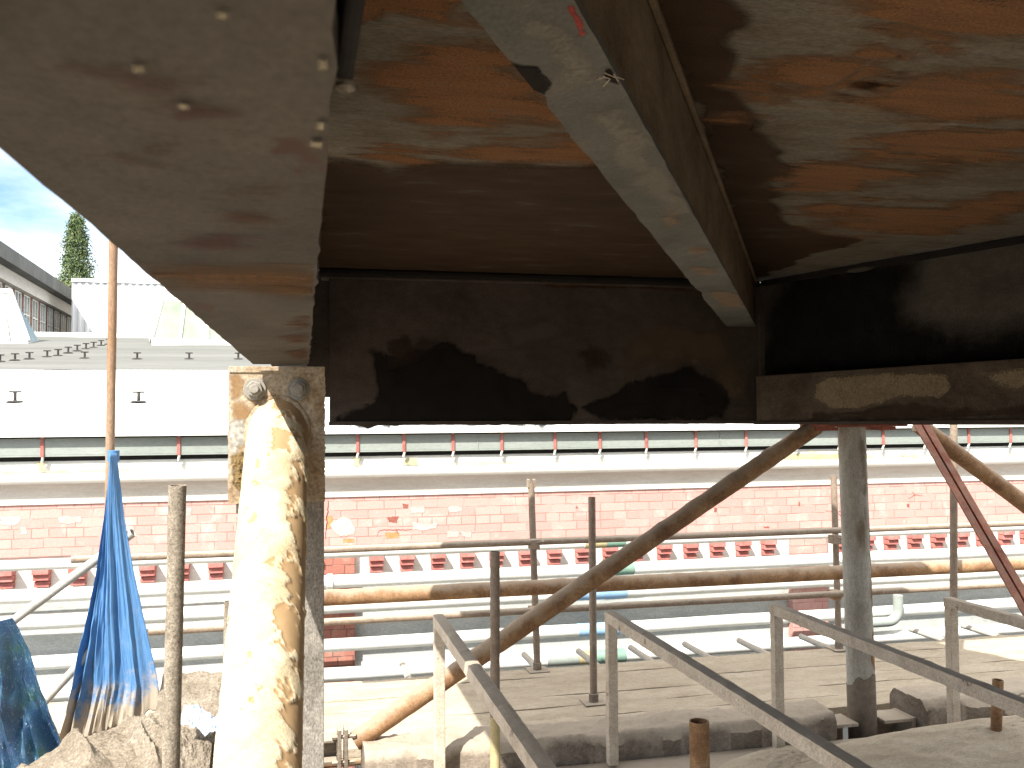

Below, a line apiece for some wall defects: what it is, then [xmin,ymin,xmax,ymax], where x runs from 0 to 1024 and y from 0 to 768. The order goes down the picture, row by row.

corrosion [845,0,1024,54]
corrosion [348,43,594,166]
leakage [658,0,862,277]
corrosion [231,374,248,421]
corrosion [230,452,244,490]